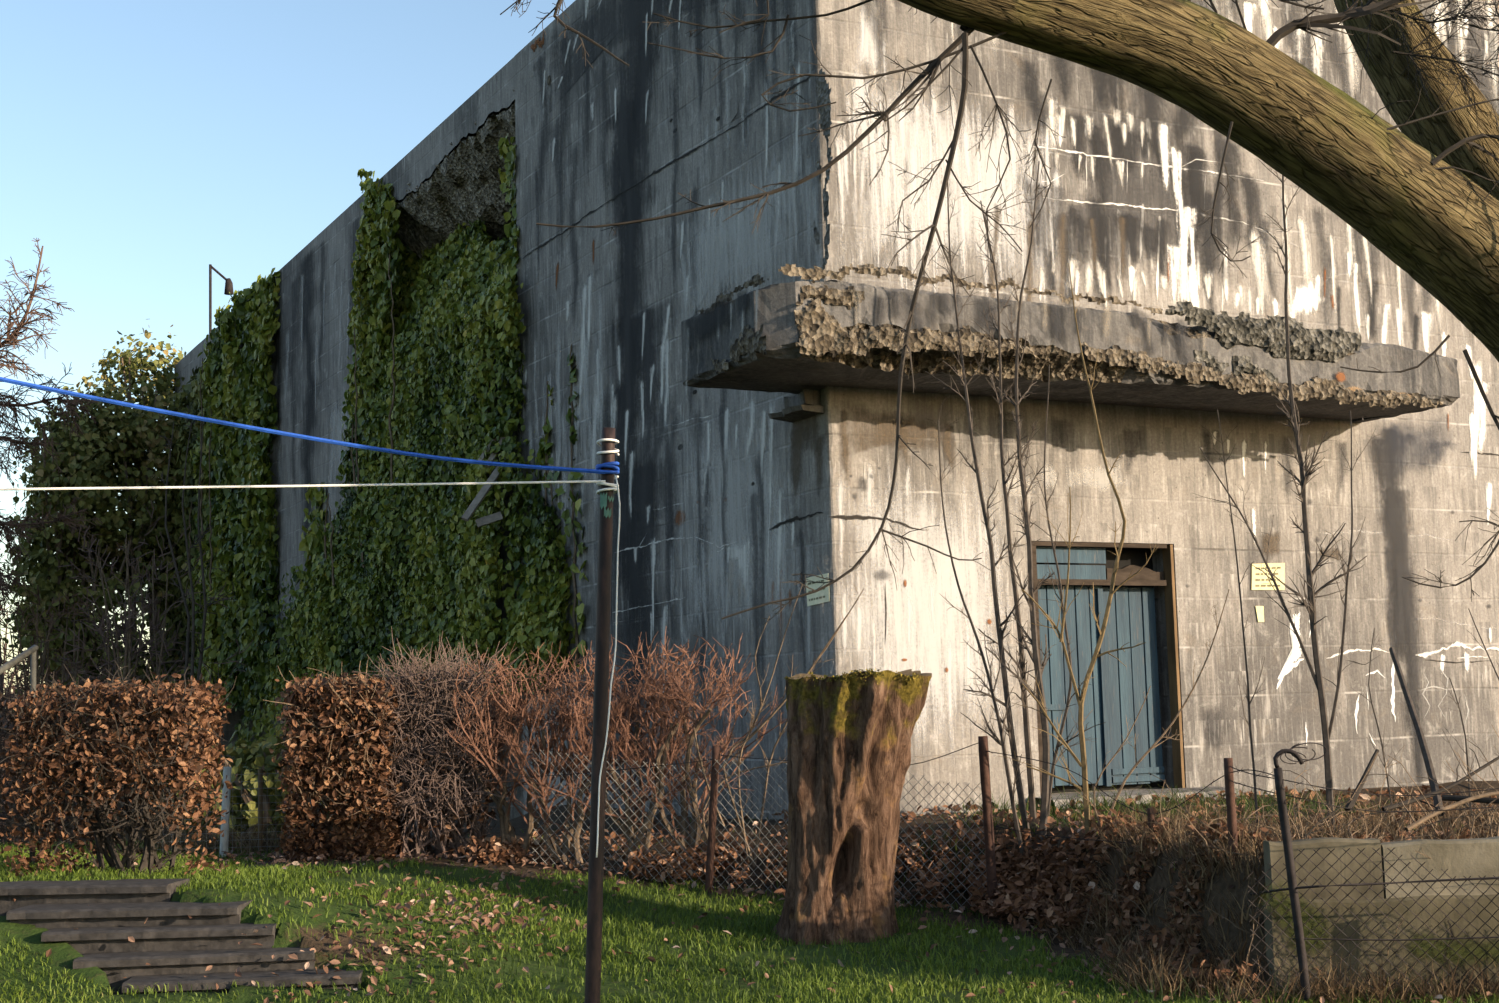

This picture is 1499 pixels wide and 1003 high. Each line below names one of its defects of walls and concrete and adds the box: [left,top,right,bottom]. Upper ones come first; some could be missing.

leakage [530,0,822,786]
leakage [838,409,1008,731]
spalling [698,68,1444,410]
leakage [1086,431,1137,487]
leakage [836,0,1447,362]
leakage [1205,431,1246,476]
leakage [1326,426,1499,786]
leakage [1433,0,1499,103]
leakage [1466,345,1492,525]